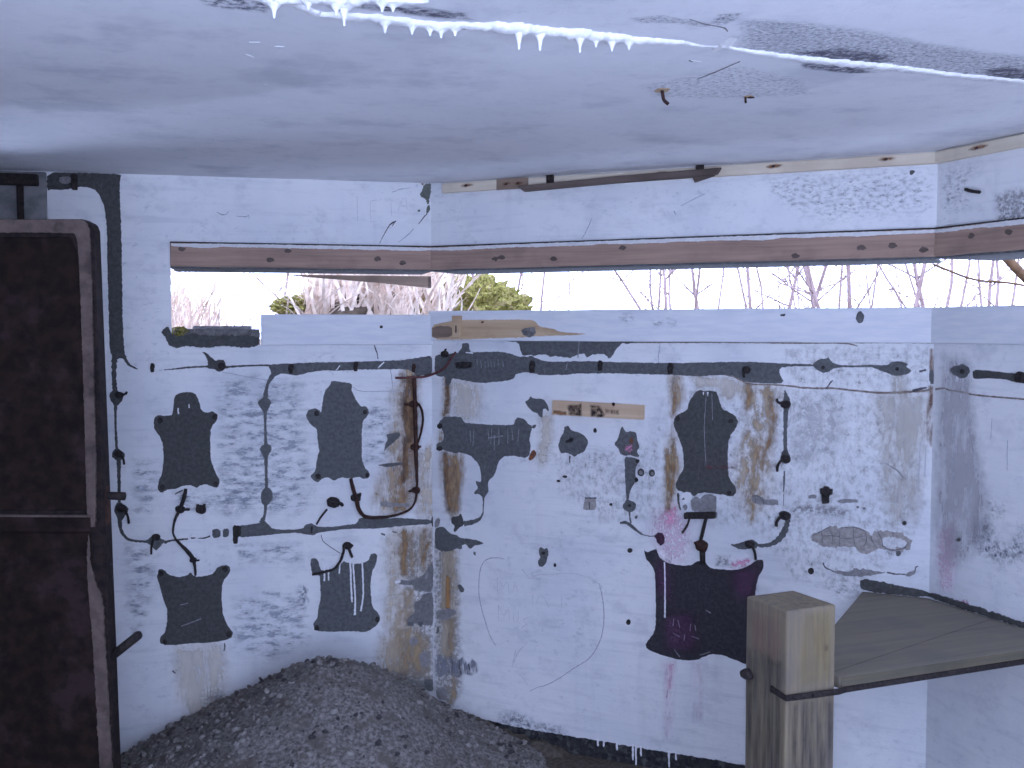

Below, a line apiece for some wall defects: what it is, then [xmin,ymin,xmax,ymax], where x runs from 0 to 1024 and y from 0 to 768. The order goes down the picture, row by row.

peeling [137,381,403,506]
rust [381,379,417,512]
rust [442,380,450,416]
rust [439,437,463,516]
rust [666,443,679,508]
rust [672,383,681,413]
peeling [673,390,738,512]
rust [699,379,775,521]
peeling [132,553,306,651]
peeling [310,553,380,632]
peeling [381,396,549,700]
peeling [609,427,764,664]